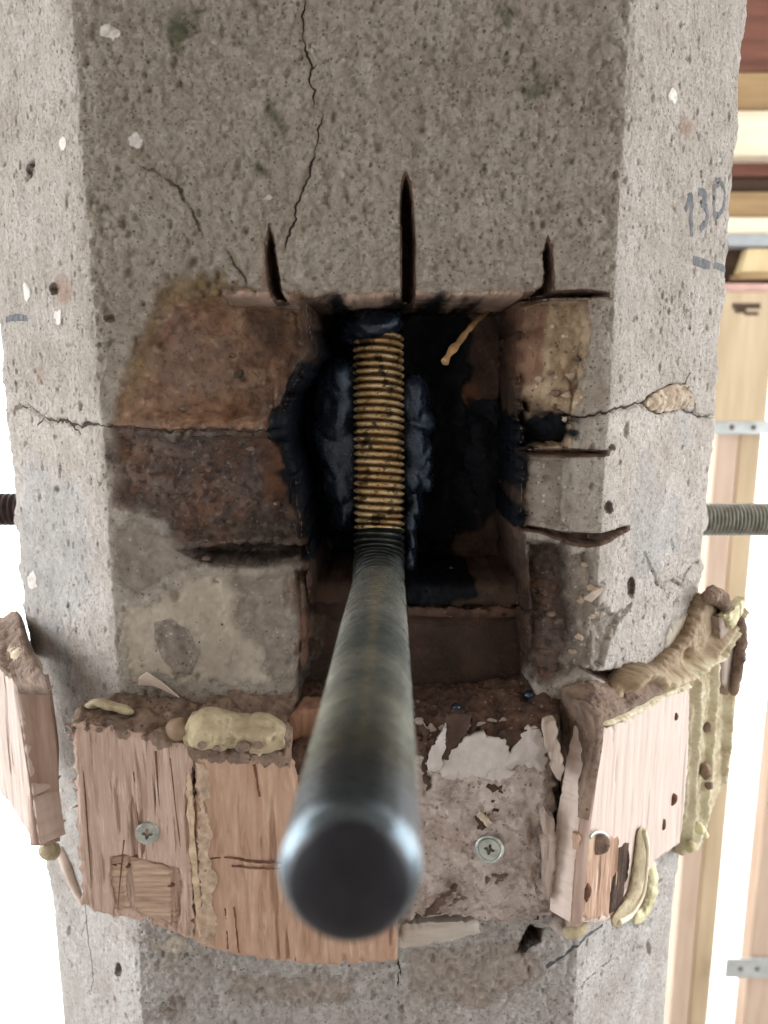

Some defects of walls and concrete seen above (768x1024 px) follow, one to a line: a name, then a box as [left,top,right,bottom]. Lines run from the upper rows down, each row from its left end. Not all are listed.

crack [285,0,323,248]
crack [140,166,203,235]
crack [18,406,265,435]
spalling [107,284,314,698]
spalling [503,298,591,526]
crack [544,372,713,427]
spalling [526,541,619,683]
peeling [419,711,548,830]